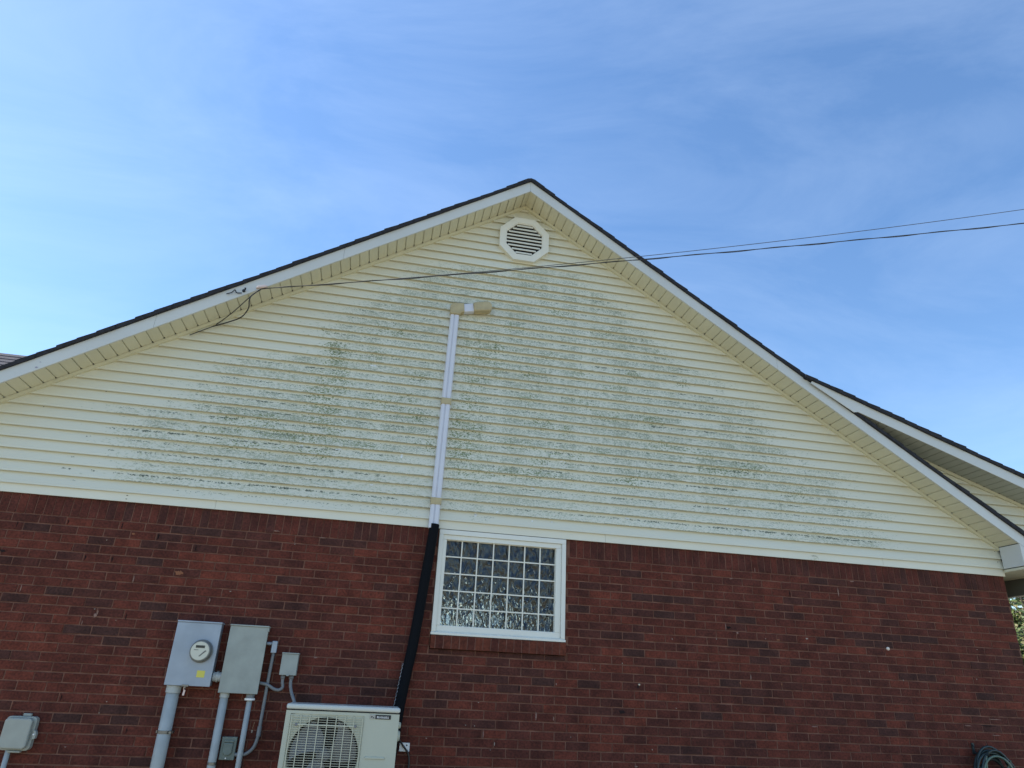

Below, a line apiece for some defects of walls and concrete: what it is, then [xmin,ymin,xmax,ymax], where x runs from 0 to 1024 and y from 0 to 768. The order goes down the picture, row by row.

mould [62,261,901,549]